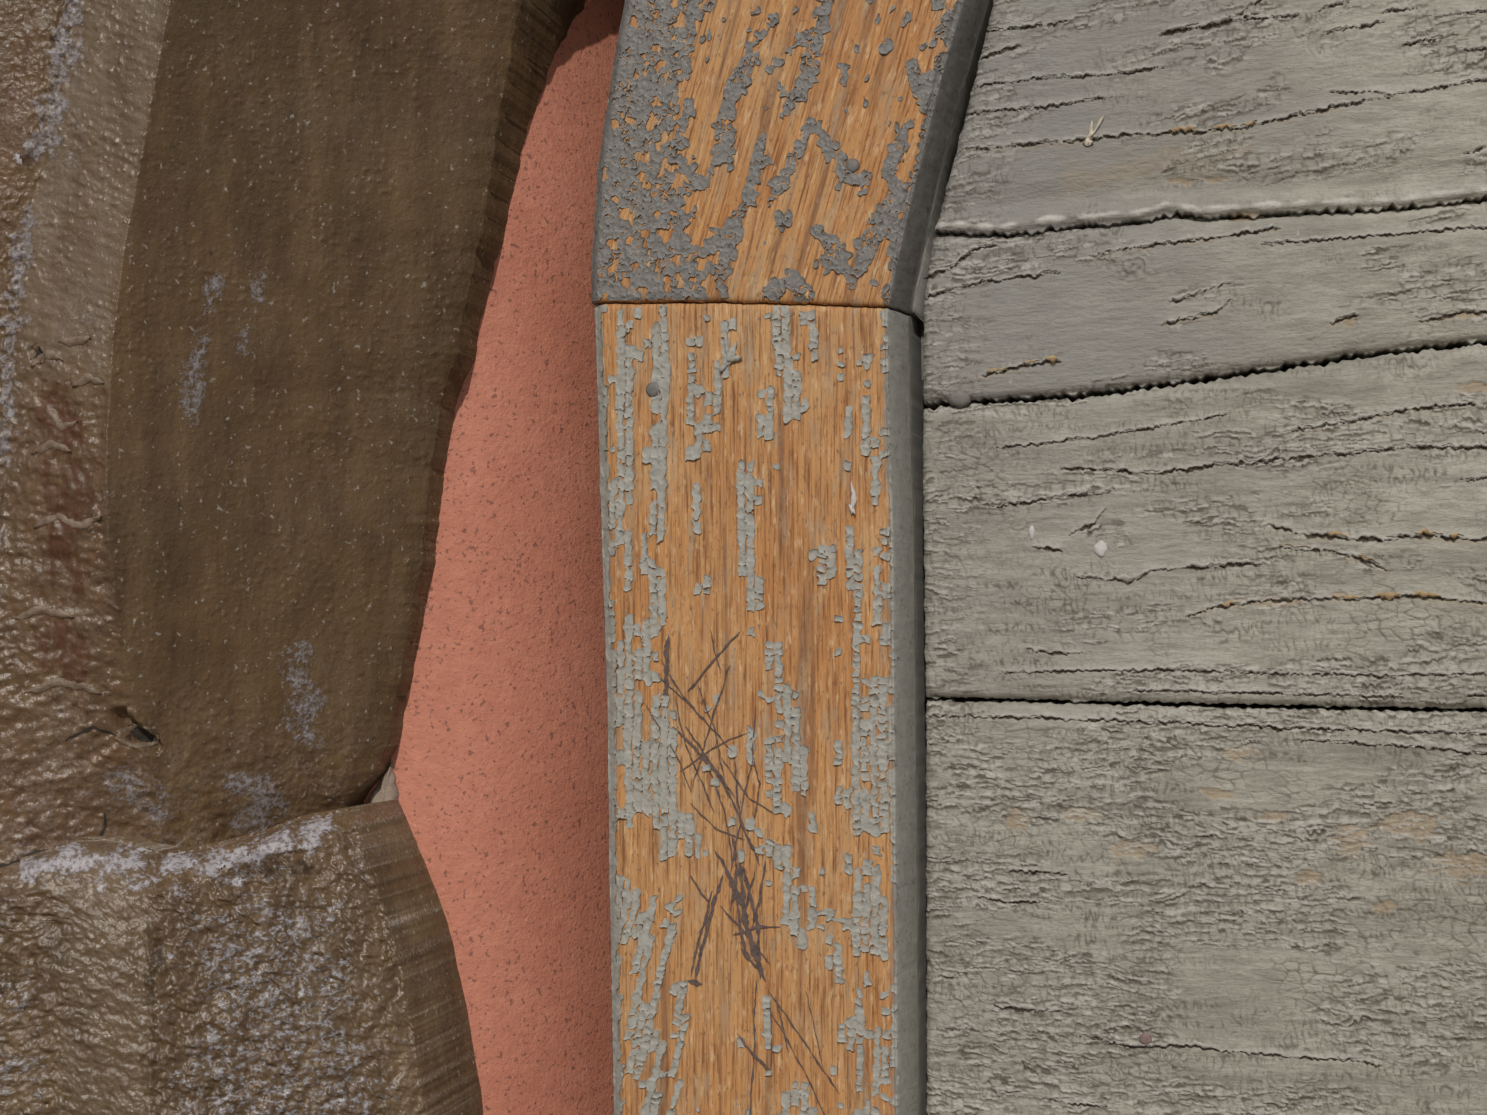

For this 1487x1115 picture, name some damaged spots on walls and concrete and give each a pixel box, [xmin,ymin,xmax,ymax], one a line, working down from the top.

crack [965,0,1487,150]
crack [923,241,1058,300]
crack [985,355,1060,377]
crack [1098,223,1487,255]
crack [1421,311,1487,322]
peeling [591,0,987,1115]
crack [993,403,1487,617]
leakage [279,641,325,745]
crack [939,648,1487,756]
leakage [19,766,396,1115]
leakage [0,1050,63,1101]
crack [994,1003,1380,1068]